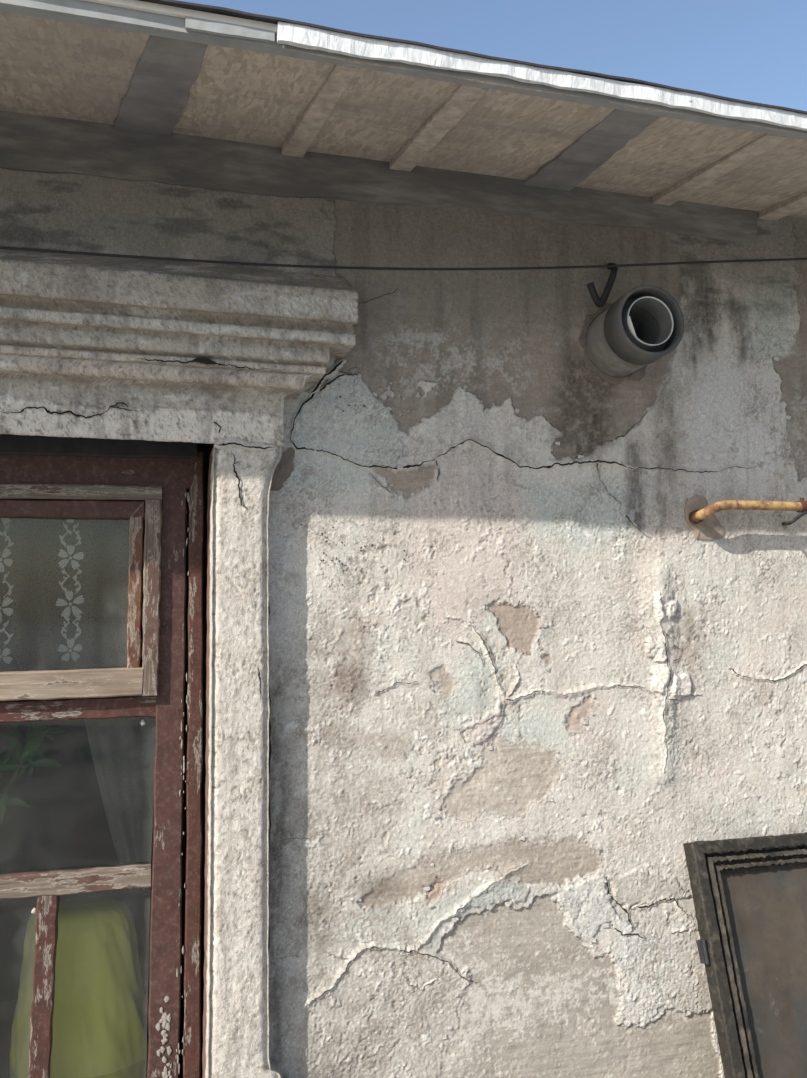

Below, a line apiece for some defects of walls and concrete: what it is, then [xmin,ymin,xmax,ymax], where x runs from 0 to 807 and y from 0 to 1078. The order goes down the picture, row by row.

peeling [332,200,686,461]
crack [0,402,143,419]
crack [135,357,783,538]
peeling [485,600,552,671]
crack [445,615,702,773]
crack [725,659,807,684]
crack [258,667,527,1012]
peeling [357,835,722,1078]
crack [606,876,694,938]